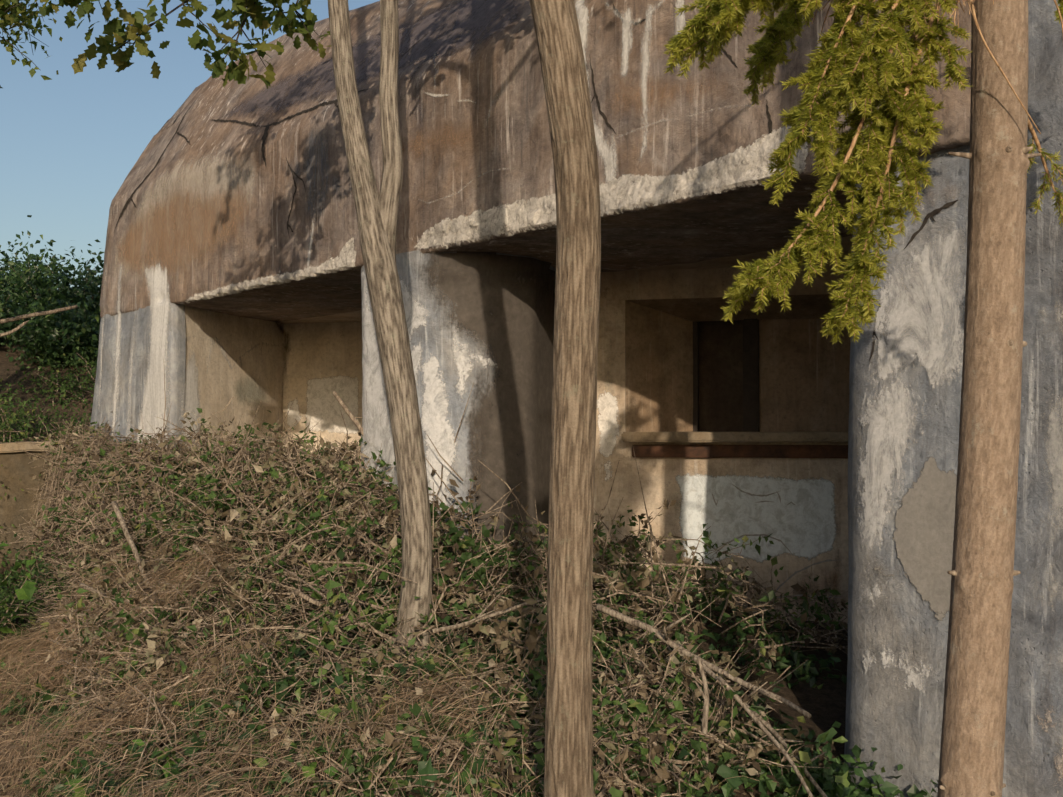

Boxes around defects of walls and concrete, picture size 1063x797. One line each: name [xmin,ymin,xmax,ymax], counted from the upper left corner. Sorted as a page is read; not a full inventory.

crack [115,88,370,238]
crack [904,200,958,249]
leakage [426,243,556,573]
peeling [867,457,957,620]